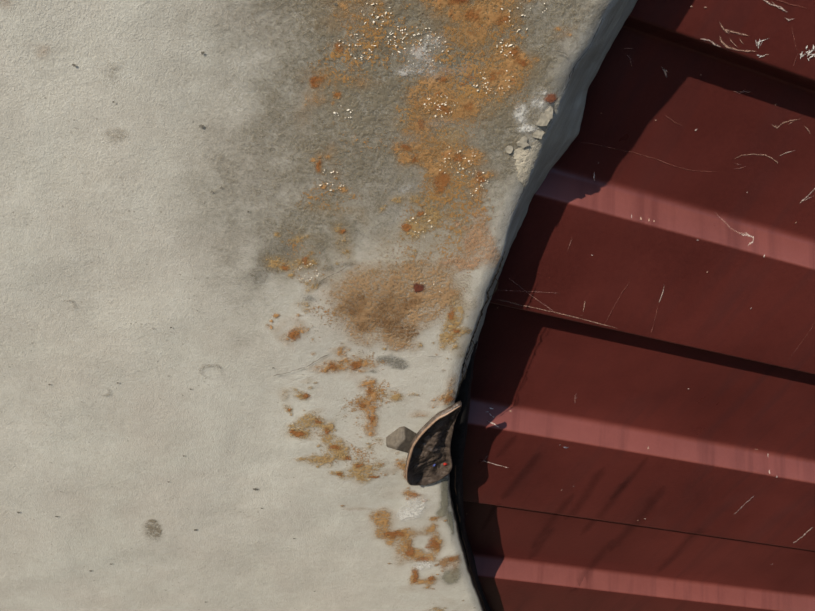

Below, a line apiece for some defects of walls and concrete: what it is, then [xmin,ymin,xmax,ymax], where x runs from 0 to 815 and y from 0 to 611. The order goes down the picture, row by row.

rust [266,0,539,502]
leakage [243,0,594,284]
crack [454,252,505,404]
rust [369,465,486,611]